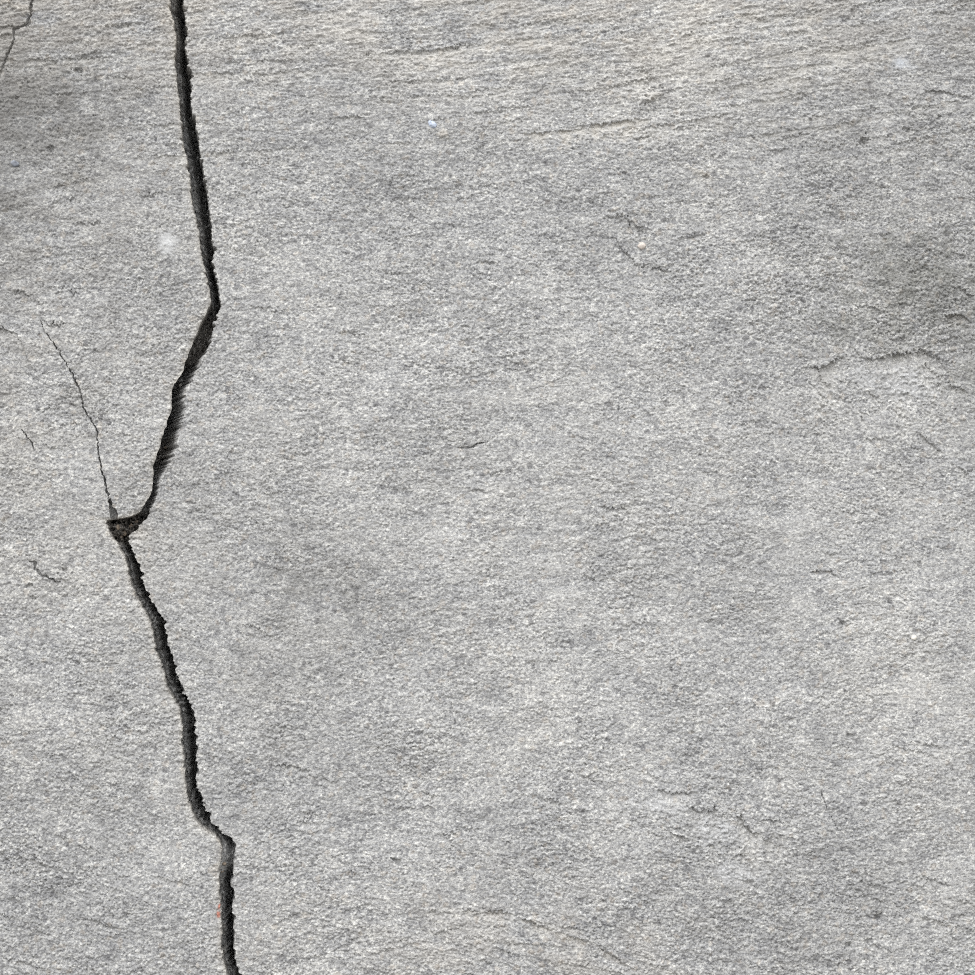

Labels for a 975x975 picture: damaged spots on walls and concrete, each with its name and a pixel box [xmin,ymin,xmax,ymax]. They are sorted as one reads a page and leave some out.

crack [0,0,34,78]
crack [40,0,242,975]
crack [25,560,68,602]